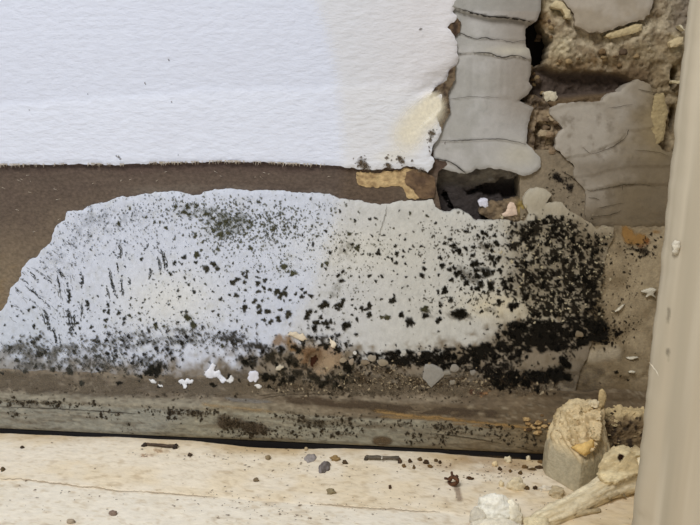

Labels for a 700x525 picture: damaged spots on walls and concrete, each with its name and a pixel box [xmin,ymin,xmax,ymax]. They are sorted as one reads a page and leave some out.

water stain [0,169,662,451]
peeling [0,0,689,311]